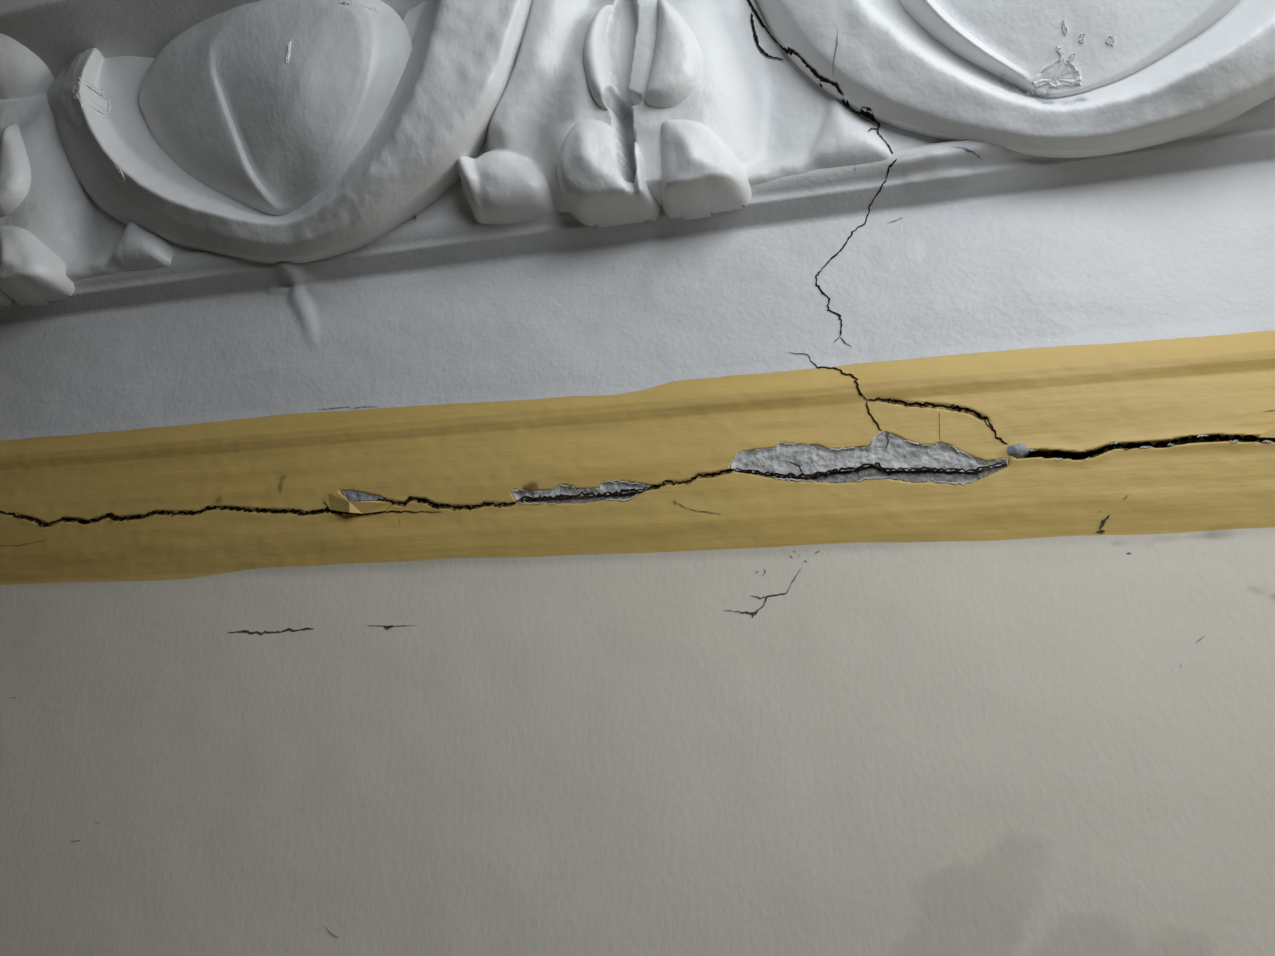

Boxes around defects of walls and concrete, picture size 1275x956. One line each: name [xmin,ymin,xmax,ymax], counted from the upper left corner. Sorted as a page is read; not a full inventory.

peeling [1025,20,1086,103]
crack [748,0,1275,461]
spalling [730,432,1008,484]
spalling [510,479,650,504]
crack [649,469,734,514]
crack [0,496,517,546]